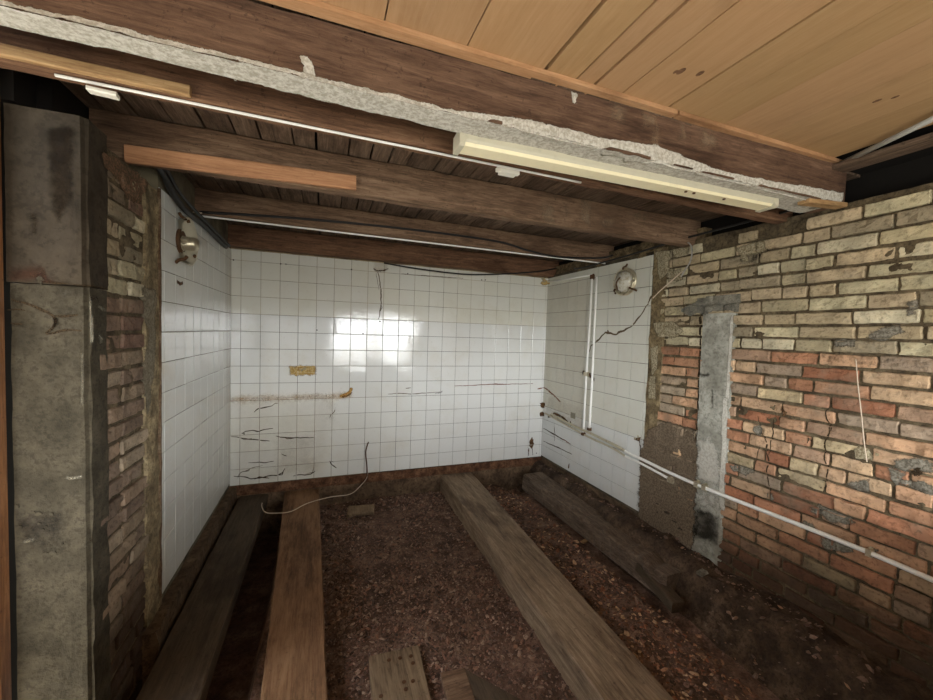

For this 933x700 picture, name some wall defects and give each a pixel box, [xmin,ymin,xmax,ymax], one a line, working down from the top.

peeling [0,0,844,213]
water stain [48,127,73,218]
crack [589,294,653,352]
crack [231,403,336,479]
water stain [693,315,734,541]
peeling [888,467,933,496]